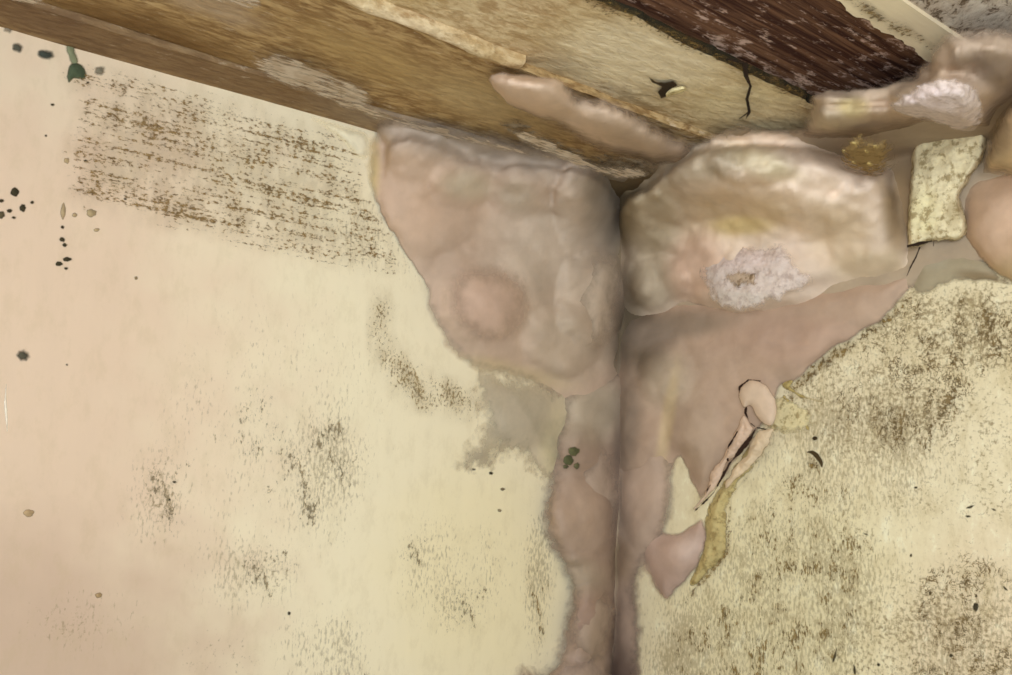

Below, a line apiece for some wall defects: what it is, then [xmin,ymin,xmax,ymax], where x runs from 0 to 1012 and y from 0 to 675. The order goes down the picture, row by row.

damp [56,46,396,274]
crack [723,58,752,119]
damp [790,292,1012,450]
peeling [690,379,823,596]
damp [665,469,874,675]
damp [911,556,1012,675]